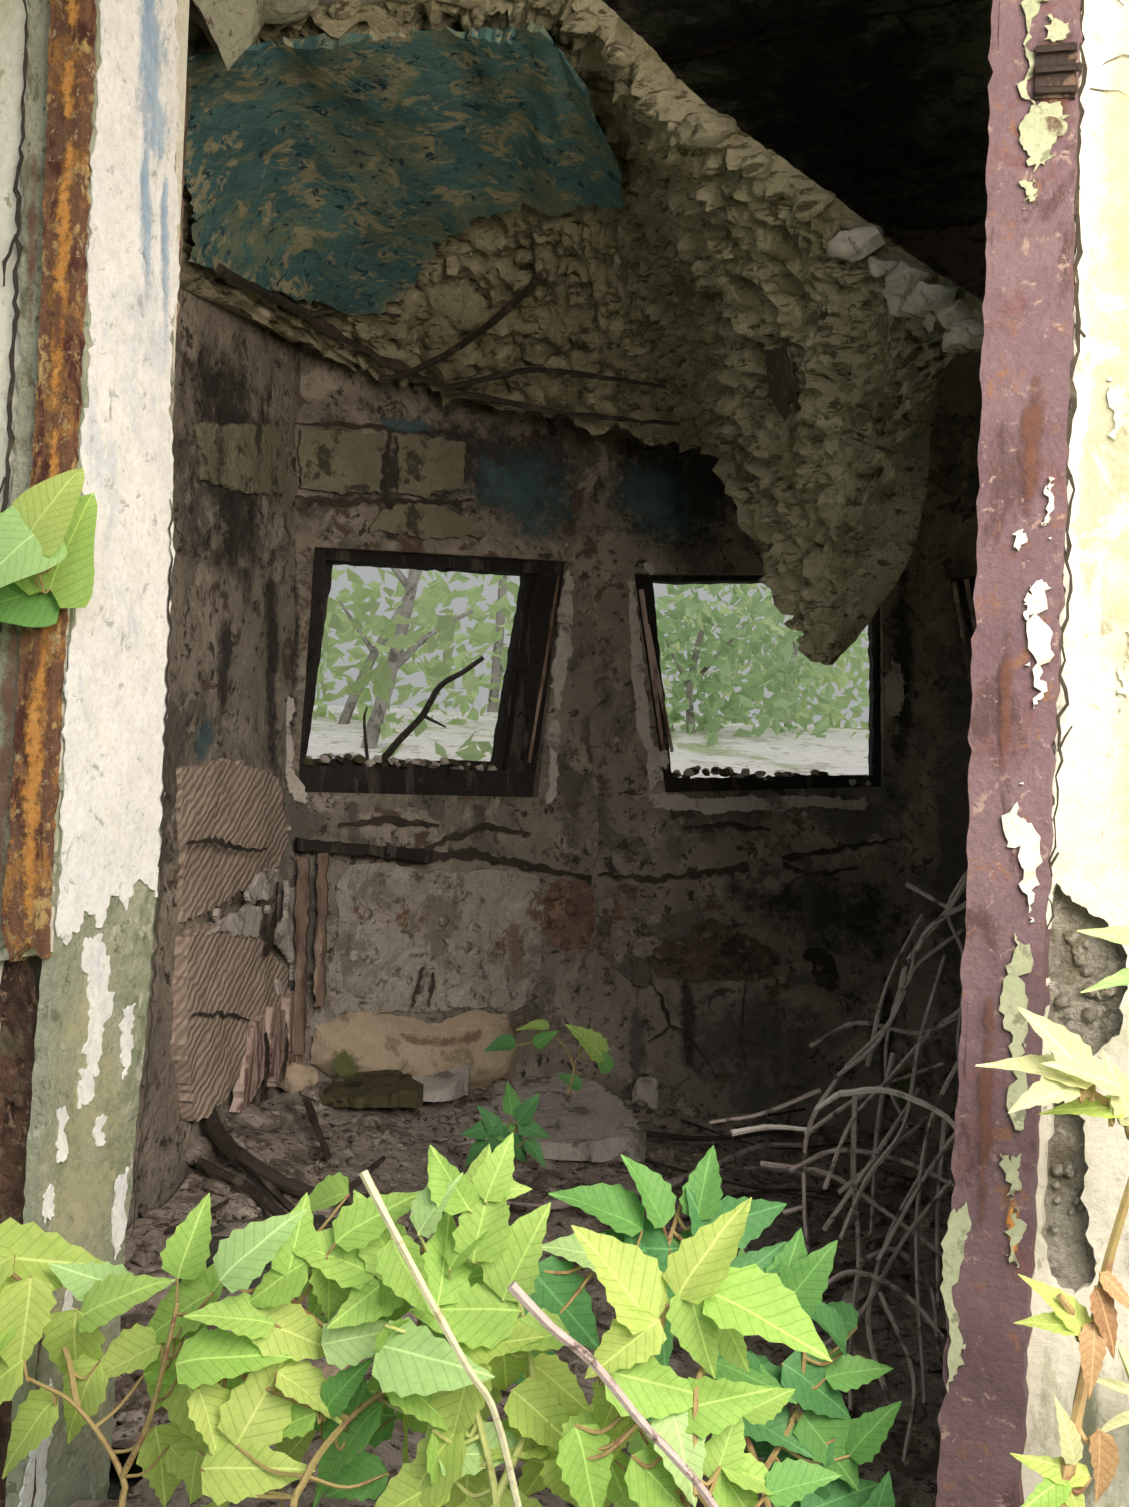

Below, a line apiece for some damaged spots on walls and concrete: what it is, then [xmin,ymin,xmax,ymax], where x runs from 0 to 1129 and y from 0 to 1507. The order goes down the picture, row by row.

corrosion [60,0,79,121]
corrosion [28,143,74,409]
corrosion [0,624,47,935]
corrosion [49,431,59,478]
peeling [55,0,545,1163]
crack [131,499,894,1238]
peeling [544,570,577,804]
spalling [999,0,1129,1131]
peeling [111,1167,129,1260]
peeling [940,1202,972,1394]
spalling [999,1101,1096,1291]
peeling [0,1400,53,1507]